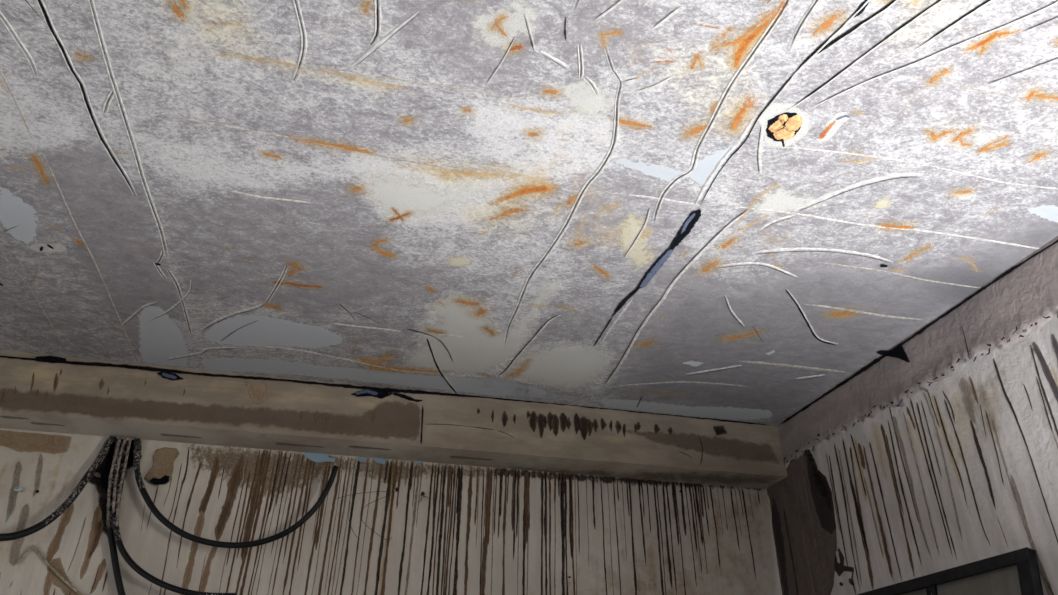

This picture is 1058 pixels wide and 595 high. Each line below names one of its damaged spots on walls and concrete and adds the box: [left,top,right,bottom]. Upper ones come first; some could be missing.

crack [25,0,288,360]
corrosion [489,175,555,219]
crack [486,0,674,377]
corrosion [700,0,788,68]
spalling [759,103,850,148]
crack [594,0,1058,386]
corrosion [970,31,1013,54]
water stain [0,368,775,595]
water stain [826,390,991,589]
peeling [767,314,1058,595]
water stain [960,377,1054,595]
water stain [1023,334,1058,448]